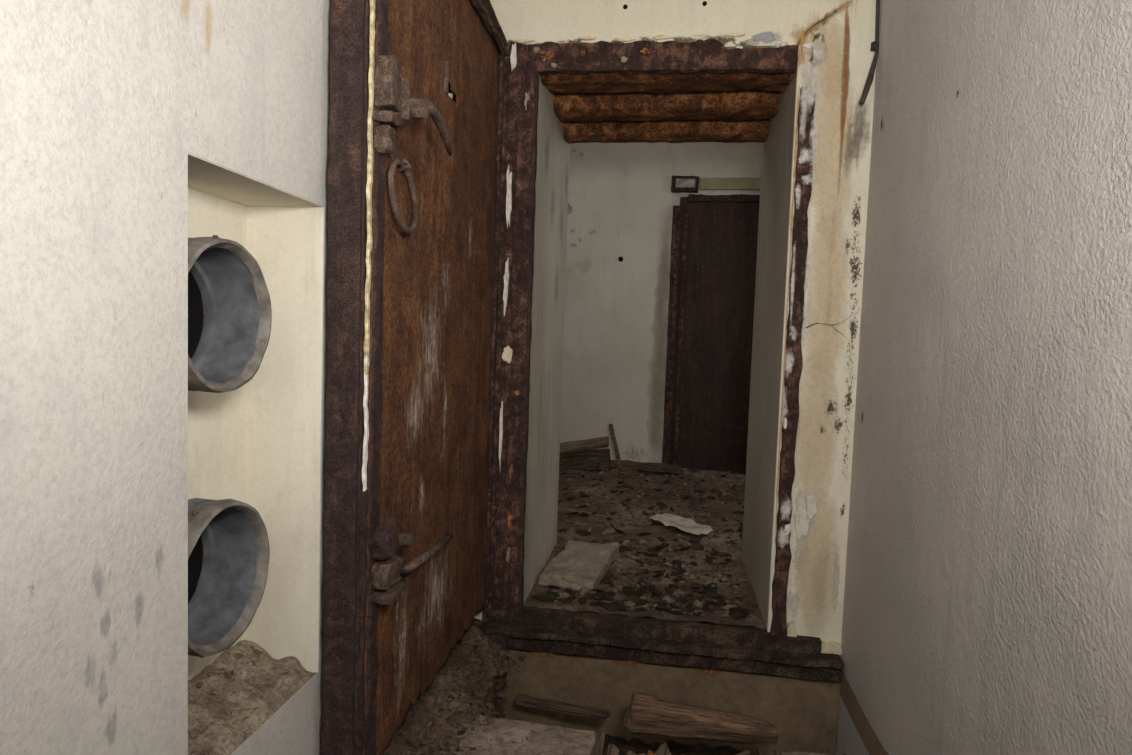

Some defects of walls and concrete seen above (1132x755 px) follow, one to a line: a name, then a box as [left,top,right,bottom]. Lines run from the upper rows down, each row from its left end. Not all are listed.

spalling [610,32,786,49]
rust [791,101,799,233]
peeling [795,36,849,206]
damp [846,109,866,162]
peeling [791,238,841,348]
damp [820,196,862,475]
peeling [779,379,839,637]